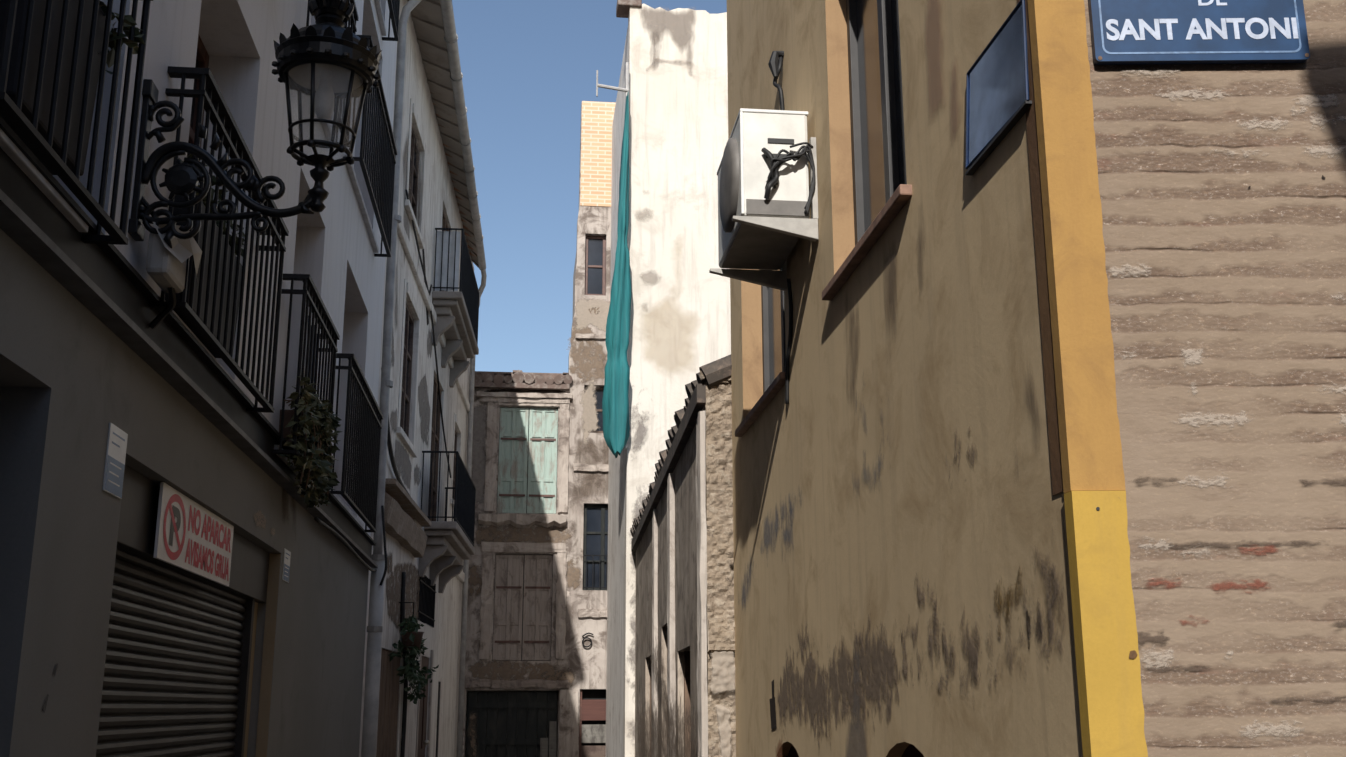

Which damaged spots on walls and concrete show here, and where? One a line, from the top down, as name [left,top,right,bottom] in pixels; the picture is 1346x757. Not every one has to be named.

leakage [642,10,694,64]
spalling [568,307,606,443]
peeling [471,404,571,546]
peeling [633,412,647,450]
peeling [386,554,424,633]
peeling [468,565,482,596]
peeling [567,559,581,589]
peeling [994,550,1062,647]
peeling [469,660,575,689]
peeling [629,596,696,757]
peeling [710,651,735,757]
peeling [778,585,990,736]